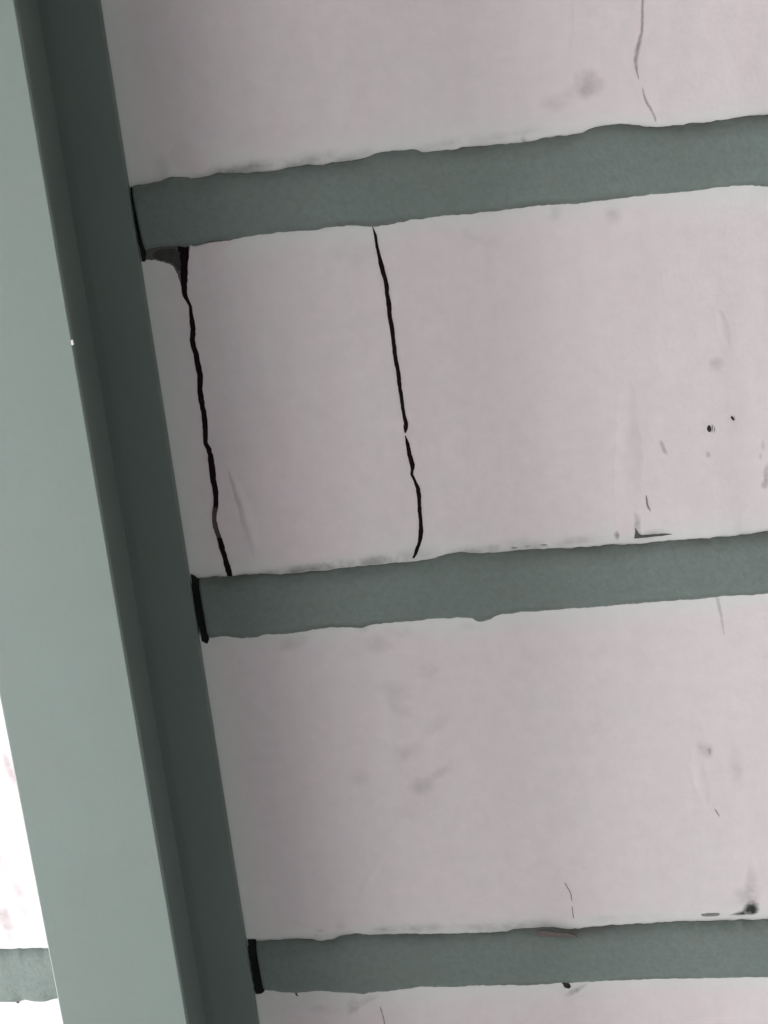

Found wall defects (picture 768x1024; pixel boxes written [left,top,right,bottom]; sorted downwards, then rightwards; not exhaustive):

crack [177,246,232,576]
crack [372,227,423,558]